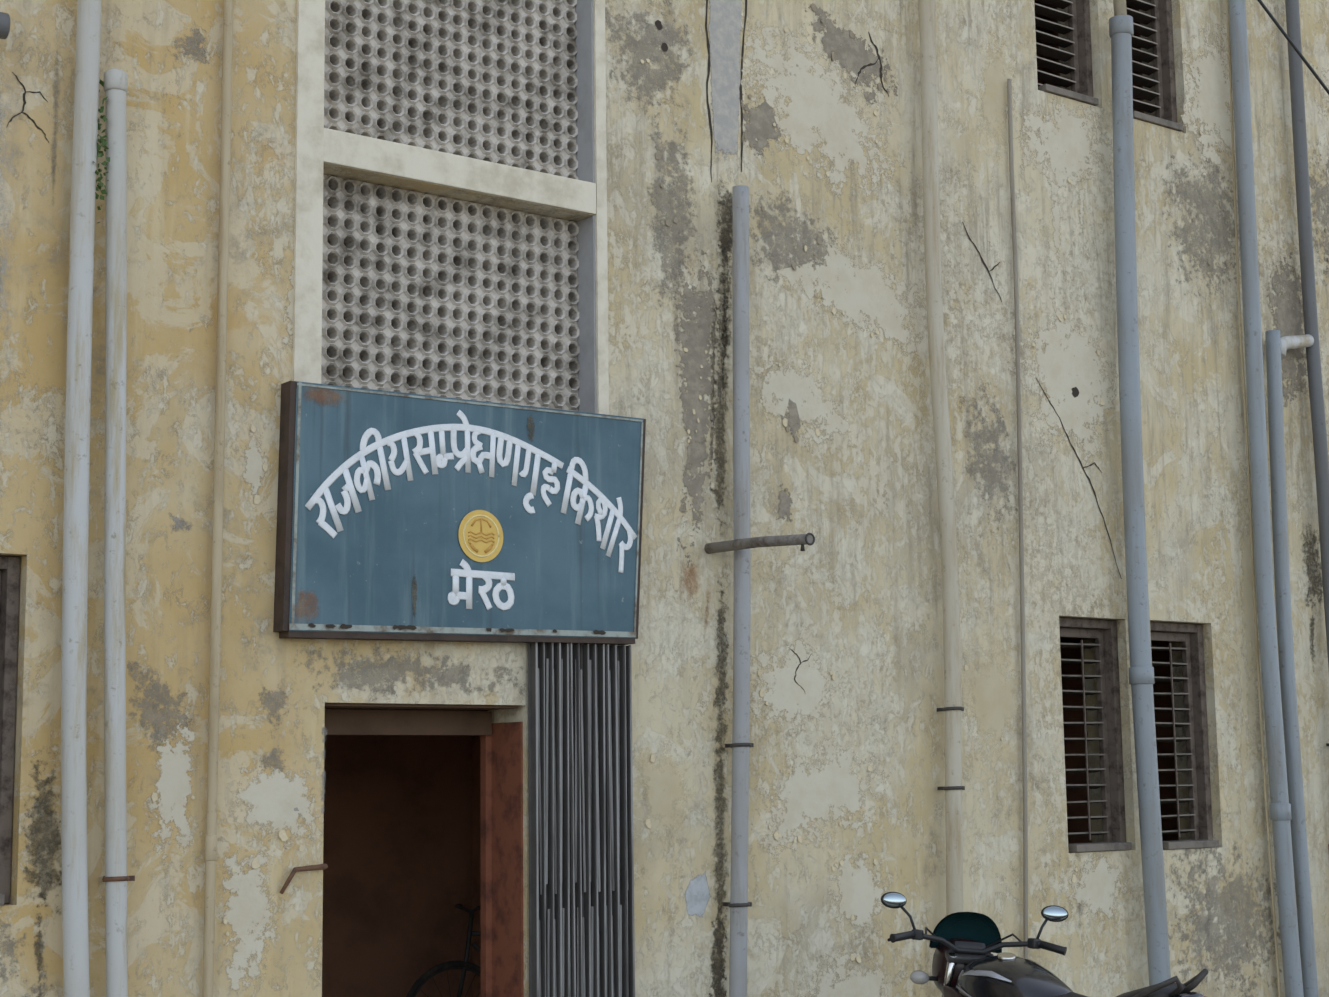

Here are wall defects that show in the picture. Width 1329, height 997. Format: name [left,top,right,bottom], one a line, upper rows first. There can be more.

crack [6,72,49,143]
water stain [750,195,835,281]
water stain [710,191,732,525]
water stain [0,760,62,997]
peeling [147,708,201,867]
peeling [219,757,320,990]
water stain [709,585,729,997]